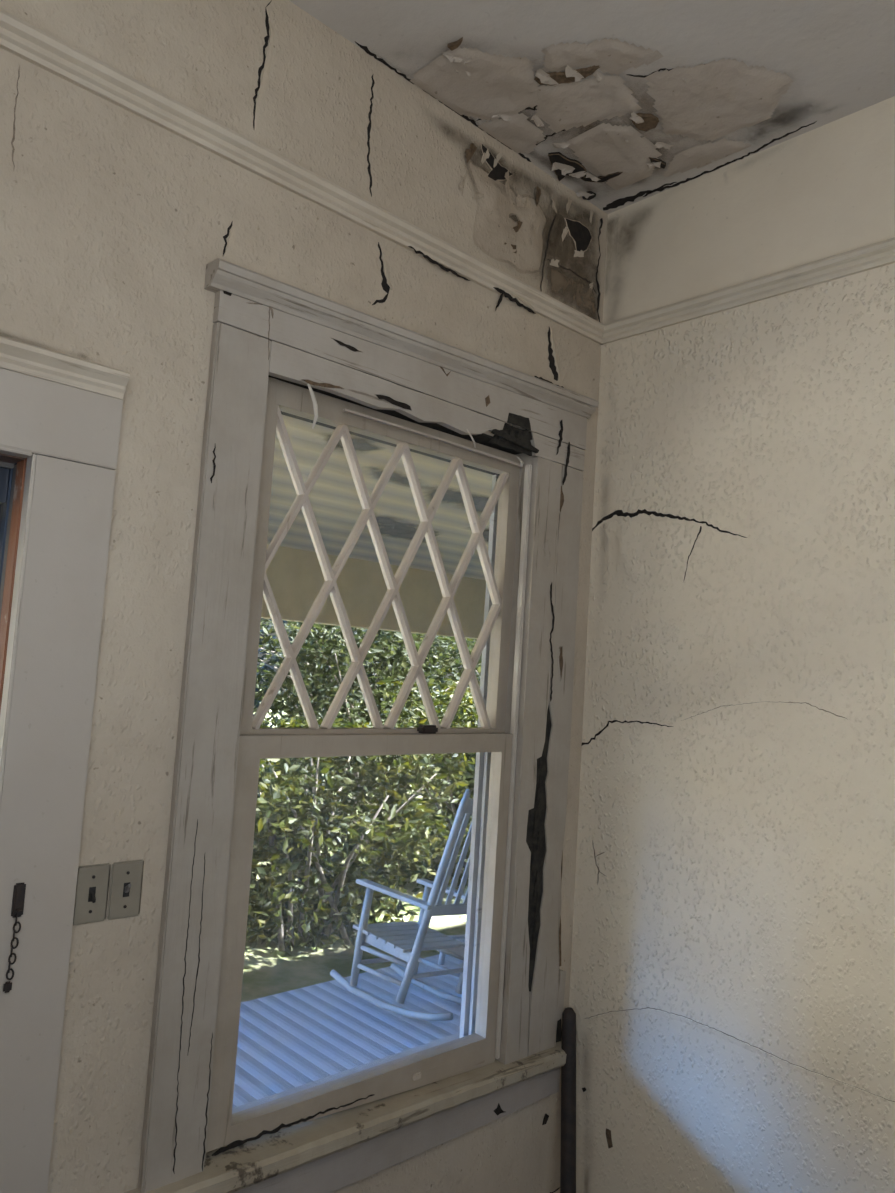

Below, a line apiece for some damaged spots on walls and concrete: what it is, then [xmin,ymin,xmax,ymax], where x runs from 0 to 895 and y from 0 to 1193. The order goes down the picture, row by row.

crack [253,0,275,130]
crack [355,42,565,197]
peeling [410,37,794,257]
crack [372,242,393,305]
spalling [507,413,531,431]
crack [592,509,747,579]
crack [582,701,847,745]